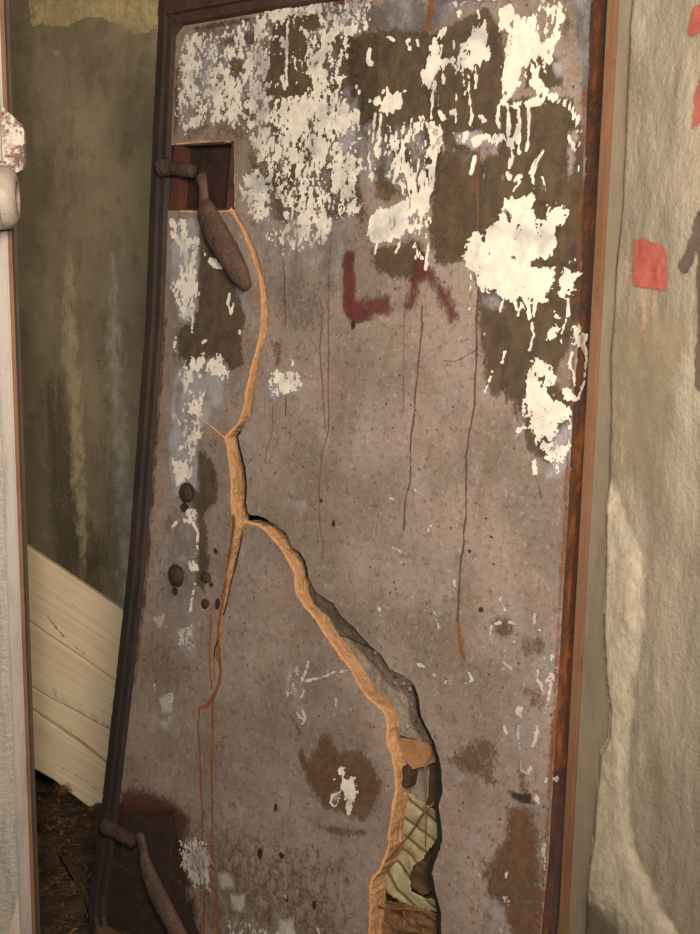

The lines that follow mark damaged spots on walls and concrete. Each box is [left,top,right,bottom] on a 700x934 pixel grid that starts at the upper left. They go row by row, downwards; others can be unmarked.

corrosion [581,1,602,152]
peeling [175,0,589,478]
peeling [168,218,249,618]
corrosion [106,615,221,934]
crack [176,141,443,934]
peeling [299,736,382,835]
spalling [308,580,432,746]
water stain [454,741,497,783]
water stain [489,596,516,670]
water stain [503,613,557,790]
corrosion [548,406,585,793]
water stain [179,837,295,934]